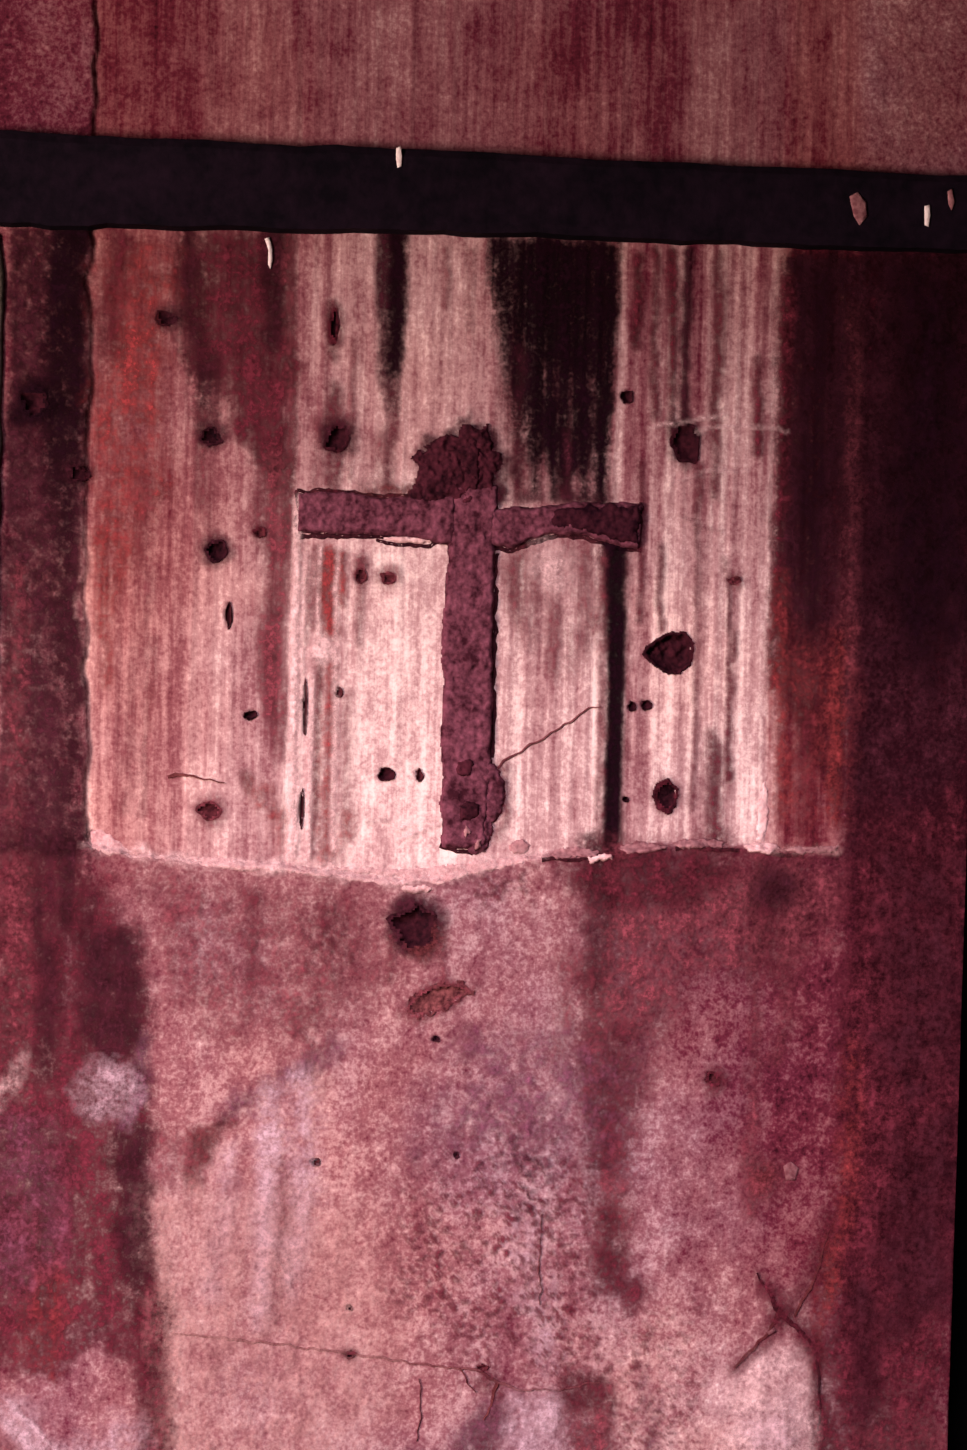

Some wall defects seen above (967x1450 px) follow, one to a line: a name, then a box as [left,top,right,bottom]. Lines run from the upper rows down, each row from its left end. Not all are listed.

damp [365,234,409,496]
damp [416,237,694,504]
damp [314,388,352,493]
rust [307,547,362,637]
rust [505,554,536,629]
rust [311,663,346,863]
crack [497,707,600,768]
damp [0,228,174,1450]
crack [536,1214,544,1305]
crack [734,1232,829,1431]
crack [171,1333,600,1442]